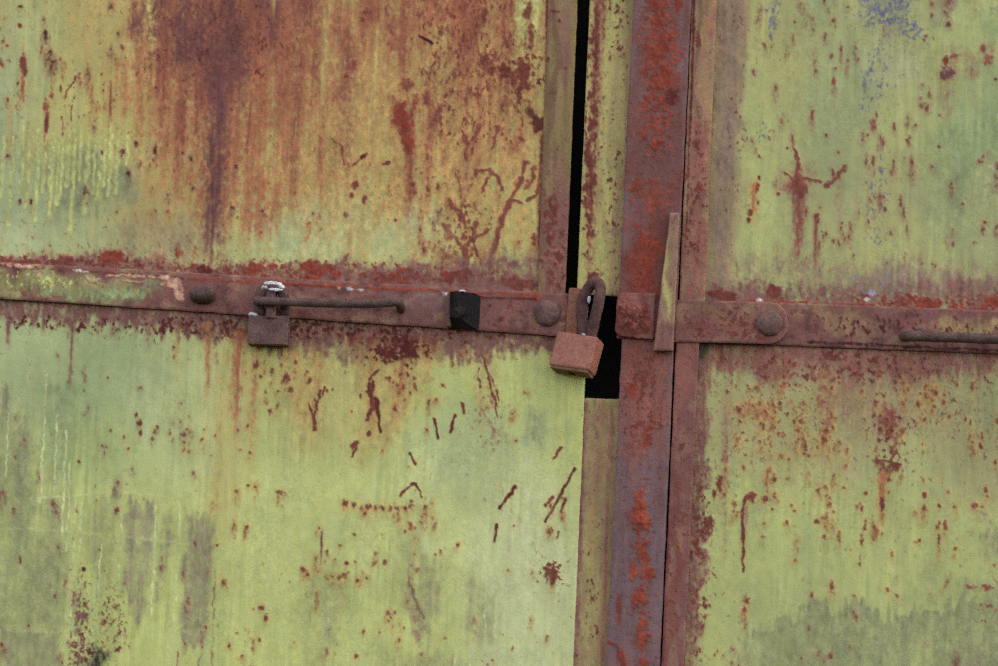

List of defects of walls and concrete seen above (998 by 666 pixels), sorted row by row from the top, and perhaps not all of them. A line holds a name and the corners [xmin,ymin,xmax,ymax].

rust [0,0,571,615]
rust [526,0,998,666]
rust [178,567,211,657]
rust [224,600,272,666]
rust [337,594,418,665]